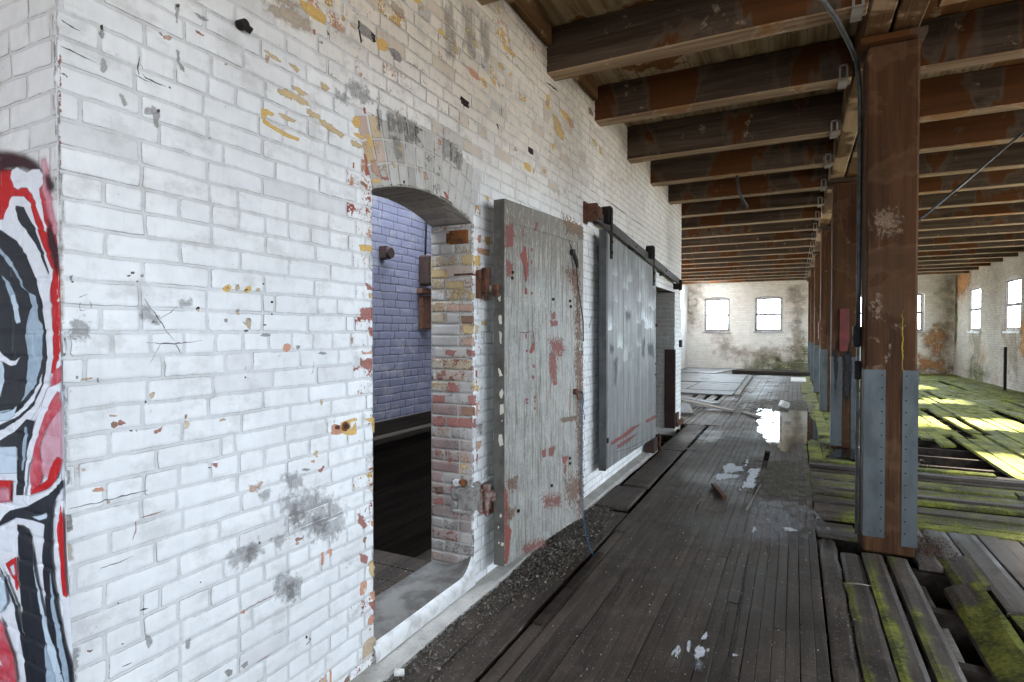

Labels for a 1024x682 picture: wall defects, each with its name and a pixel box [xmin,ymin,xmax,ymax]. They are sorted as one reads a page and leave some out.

peeling [299,0,329,35]
spalling [342,15,402,62]
peeling [261,109,299,141]
peeling [278,86,395,188]
crack [144,299,202,361]
peeling [360,283,373,337]
damp [790,288,803,356]
peeling [360,351,373,370]
spalling [331,418,374,435]